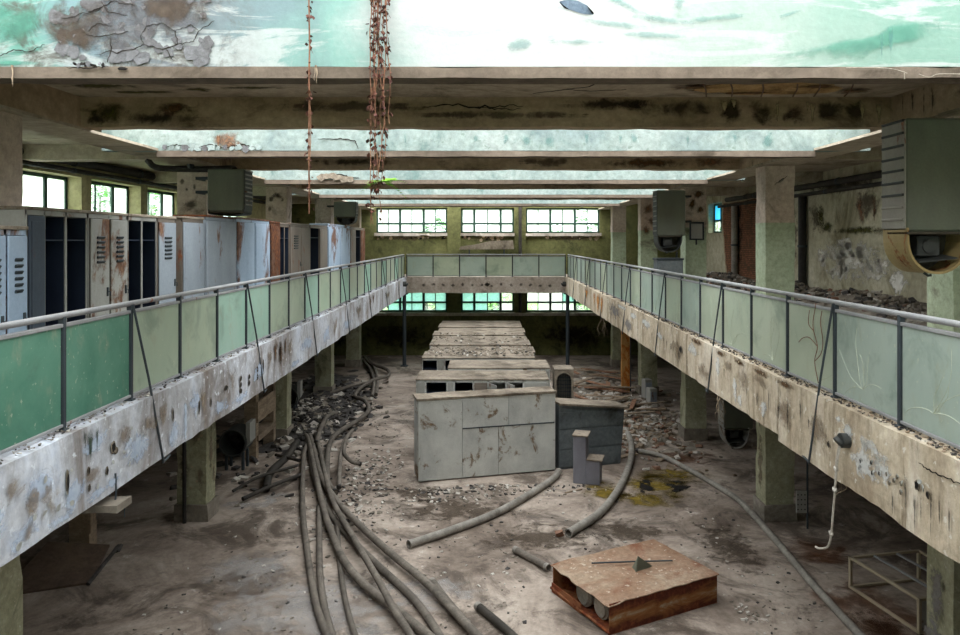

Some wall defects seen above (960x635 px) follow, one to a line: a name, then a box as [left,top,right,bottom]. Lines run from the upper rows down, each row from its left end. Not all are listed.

peeling [49,0,214,70]
damp [134,103,192,124]
damp [294,101,410,112]
crack [424,84,626,110]
damp [423,98,646,119]
peeling [162,143,262,153]
damp [525,158,566,166]
damp [614,158,675,168]
spalling [317,172,356,183]
damp [84,431,98,457]
peeling [836,416,930,499]
crack [919,463,960,484]